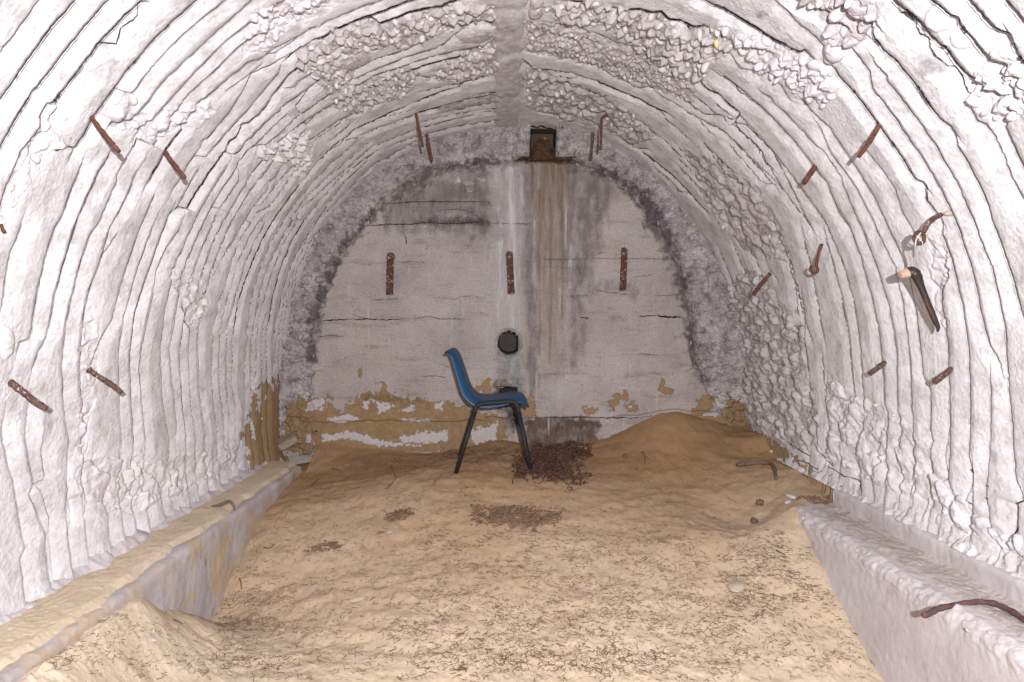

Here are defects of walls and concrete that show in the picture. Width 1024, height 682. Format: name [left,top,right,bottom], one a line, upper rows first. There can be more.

crack [363,183,527,263]
spalling [279,124,530,456]
crack [545,252,681,319]
damp [559,162,697,365]
peeling [520,396,536,419]